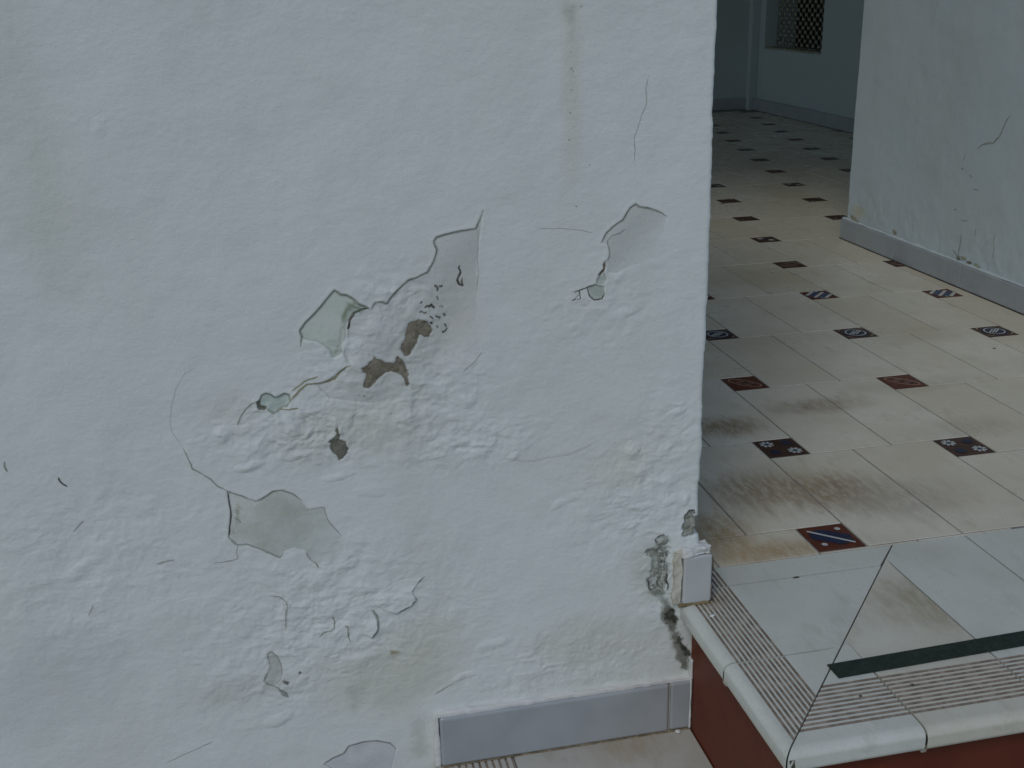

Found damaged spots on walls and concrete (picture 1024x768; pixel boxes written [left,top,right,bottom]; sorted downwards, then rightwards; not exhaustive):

peeling [572,203,666,301]
peeling [299,212,483,401]
peeling [257,393,291,414]
spalling [329,429,348,461]
crack [183,449,226,491]
peeling [217,490,341,563]
spalling [682,509,696,536]
leakage [651,542,691,670]
peeling [263,652,289,697]
peeling [323,740,396,768]